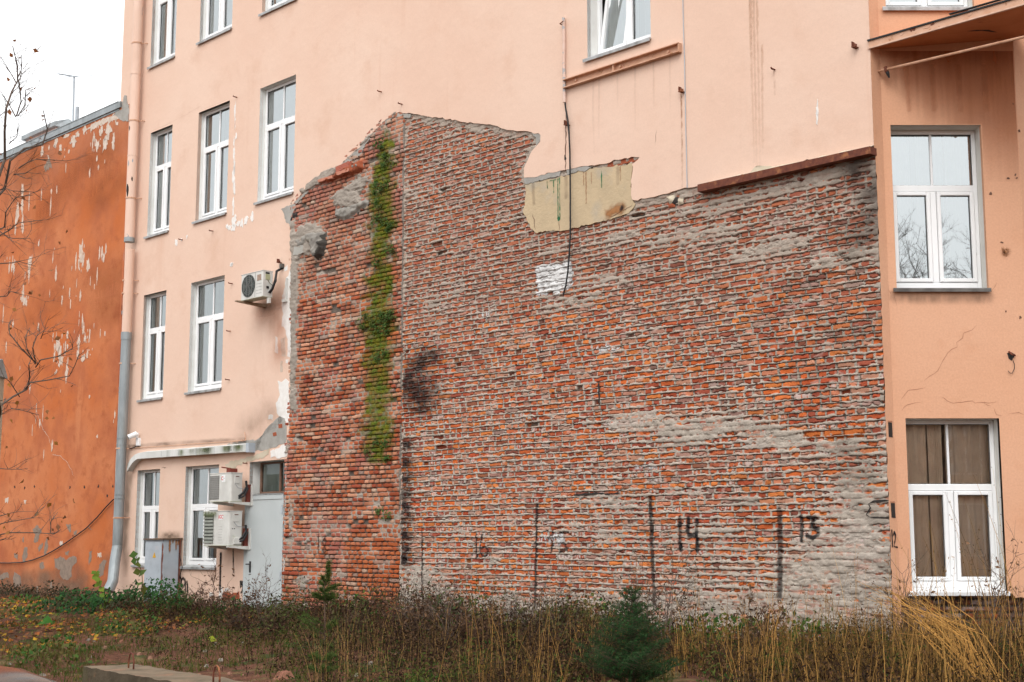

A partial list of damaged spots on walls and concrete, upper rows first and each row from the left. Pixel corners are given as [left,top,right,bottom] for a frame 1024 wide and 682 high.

peeling [14,185,57,235]
flaking render [41,95,130,178]
peeling [226,102,254,232]
spalling [318,159,366,183]
peeling [8,256,32,306]
peeling [49,238,107,393]
flaking render [225,231,327,468]
crack [902,327,1024,416]